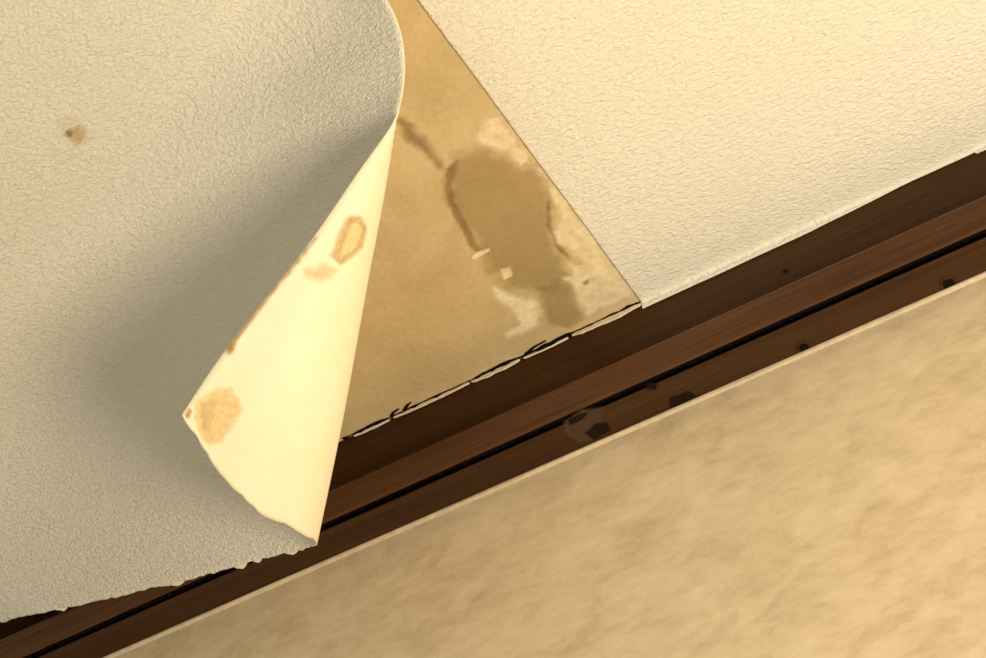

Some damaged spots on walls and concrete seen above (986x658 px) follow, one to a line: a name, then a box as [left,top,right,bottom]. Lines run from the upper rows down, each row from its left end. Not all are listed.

spalling [566,408,611,442]